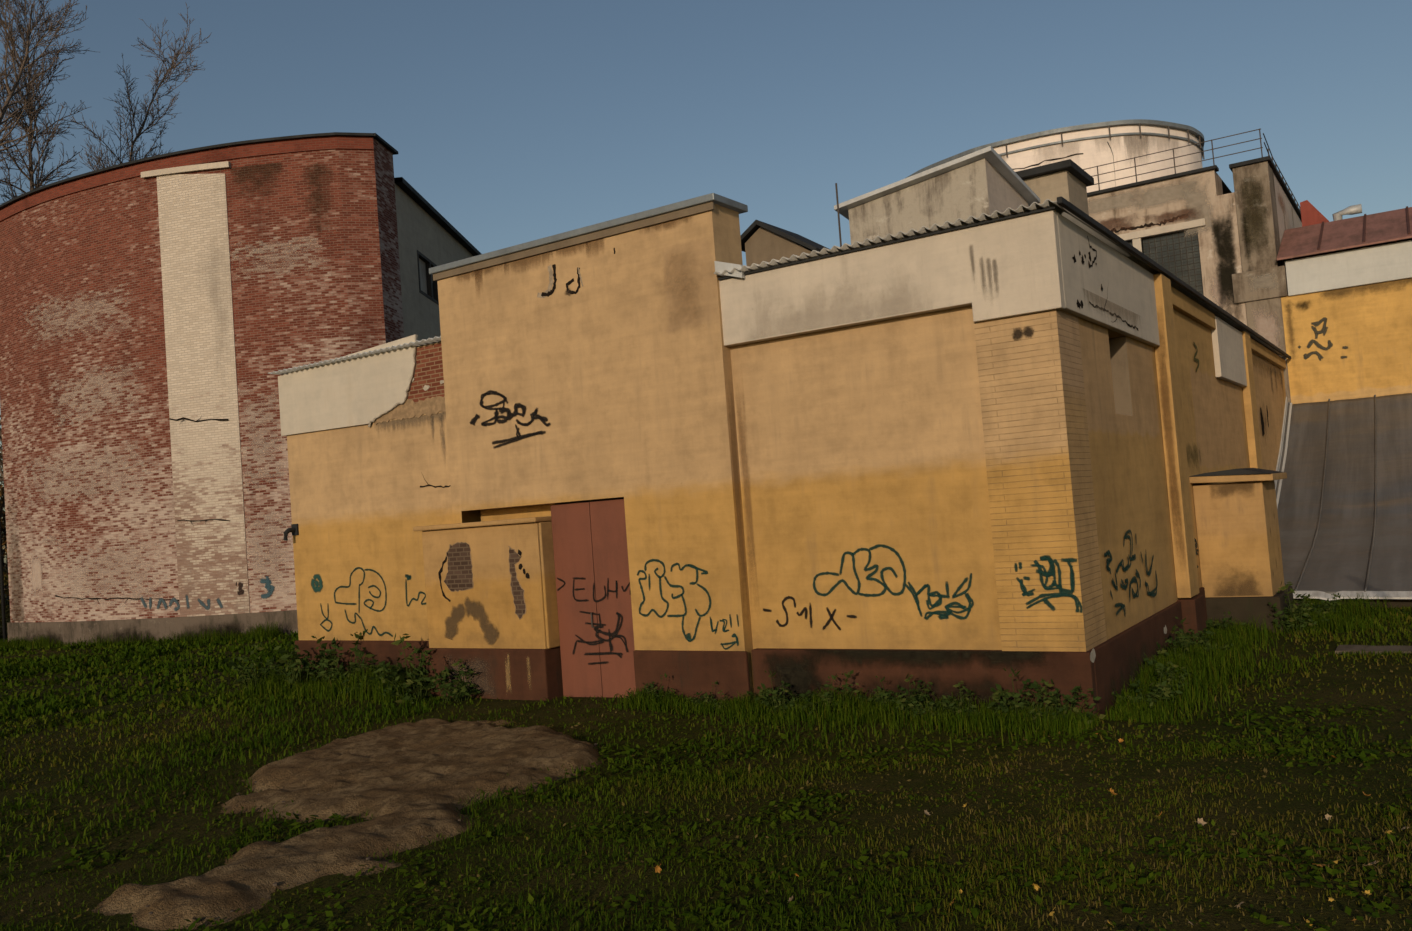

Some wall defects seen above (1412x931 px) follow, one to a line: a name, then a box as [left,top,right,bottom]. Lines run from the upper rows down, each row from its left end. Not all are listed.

crack [1087,235,1138,330]
water stain [1213,183,1266,304]
crack [169,415,228,423]
flaking render [365,334,446,427]
crack [177,518,230,526]